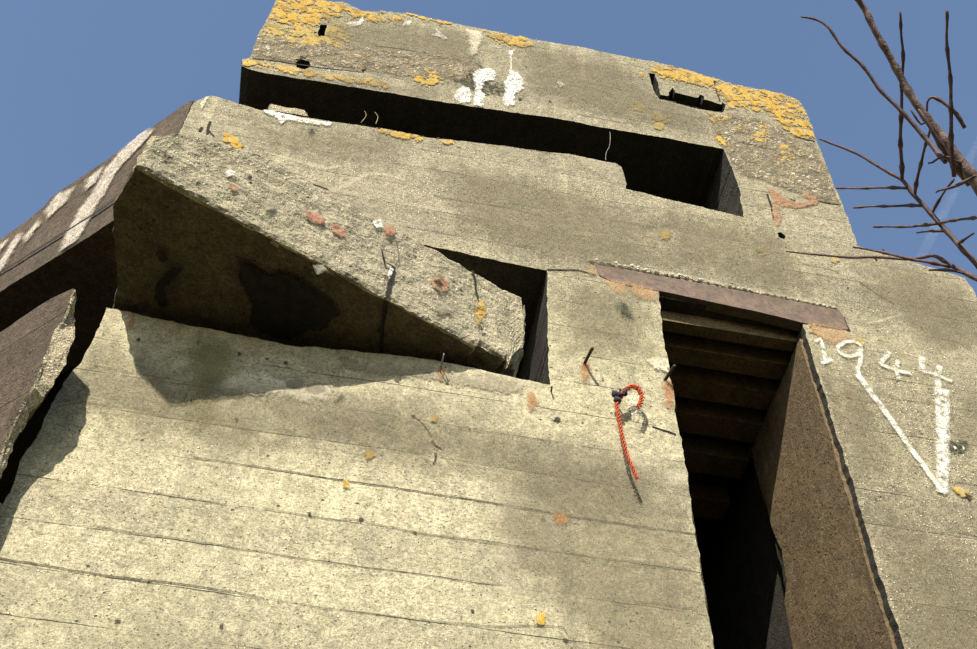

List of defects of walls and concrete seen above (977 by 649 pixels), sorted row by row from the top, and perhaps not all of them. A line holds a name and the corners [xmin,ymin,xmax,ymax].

crack [0,290,76,478]
corrosion [664,380,674,409]
crack [411,414,441,464]
crack [98,526,506,586]
crack [0,557,567,633]